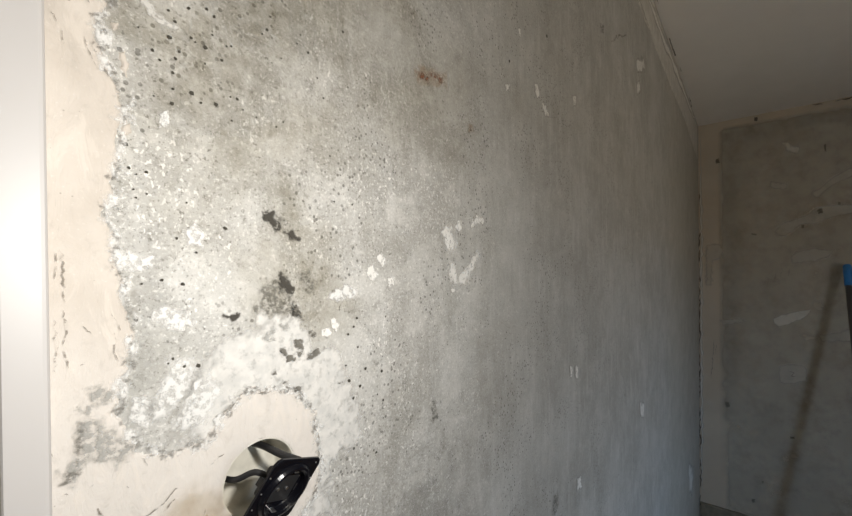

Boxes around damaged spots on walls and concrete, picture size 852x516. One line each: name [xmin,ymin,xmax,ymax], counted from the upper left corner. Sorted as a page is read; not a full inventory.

damp [263,211,301,241]
flaking render [44,0,325,516]
damp [254,272,301,316]